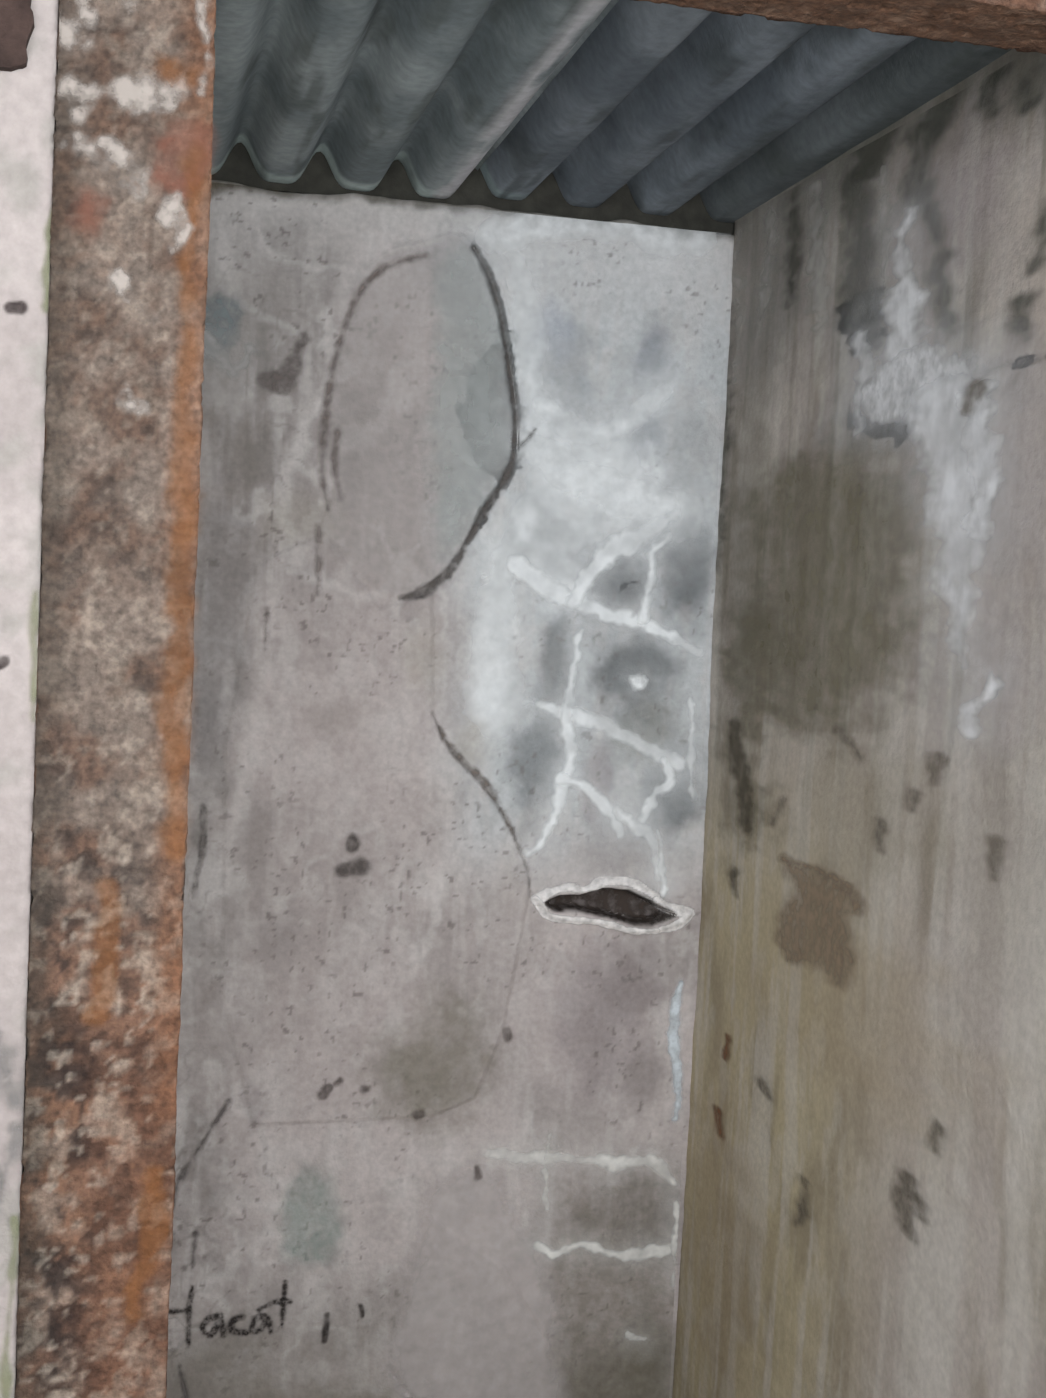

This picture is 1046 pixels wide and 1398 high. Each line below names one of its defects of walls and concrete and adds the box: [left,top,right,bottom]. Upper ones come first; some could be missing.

crack [316,256,419,573]
crack [401,246,531,599]
leakage [718,406,729,525]
leakage [759,94,1002,652]
leakage [726,457,905,744]
crack [438,726,520,850]
leakage [730,704,756,831]
leakage [961,676,1000,739]
spalling [531,876,695,935]